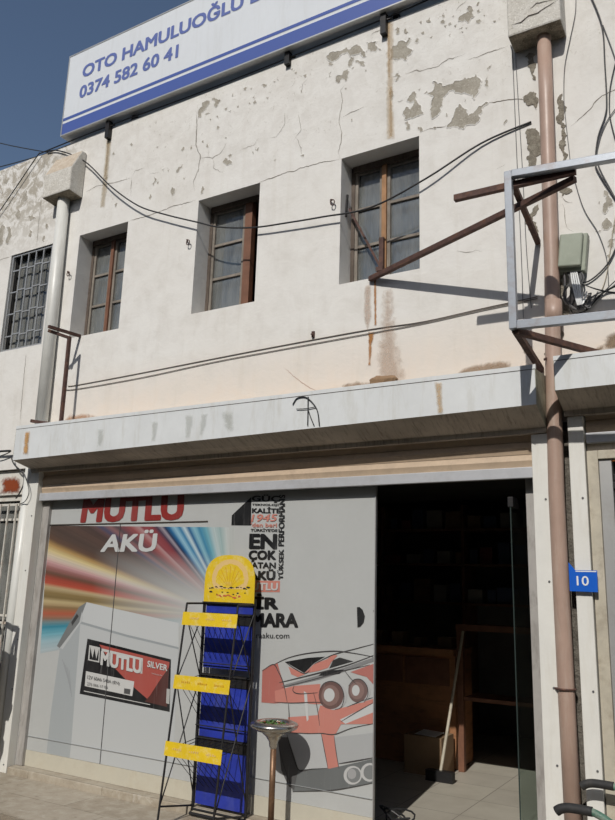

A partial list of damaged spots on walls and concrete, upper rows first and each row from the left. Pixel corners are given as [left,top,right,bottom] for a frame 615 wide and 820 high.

peeling [326,2,485,89]
spalling [525,53,536,80]
peeling [389,64,492,132]
spalling [523,92,539,109]
crack [130,116,226,221]
crack [261,93,361,182]
spalling [525,128,541,166]
peeling [0,190,36,246]
water stain [461,363,508,373]
rust [0,478,20,494]